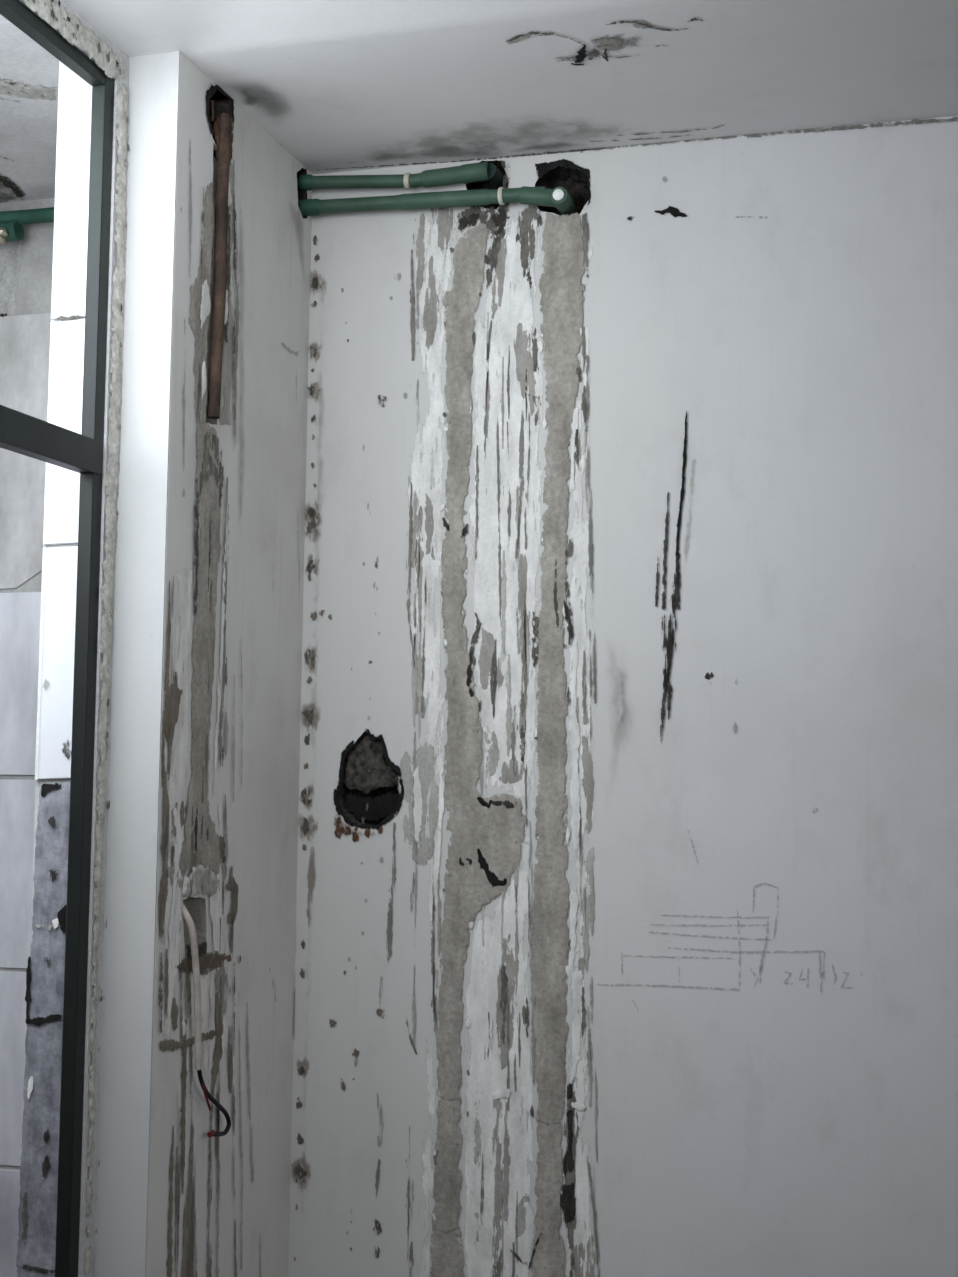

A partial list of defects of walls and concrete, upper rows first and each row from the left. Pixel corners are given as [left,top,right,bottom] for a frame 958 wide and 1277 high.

corrosion [211,100,233,152]
water stain [323,148,606,170]
spalling [466,160,509,190]
spalling [311,235,321,307]
spalling [307,508,316,533]
peeling [214,528,227,794]
peeling [159,430,224,1037]
spalling [302,708,314,745]
peeling [333,207,460,1277]
peeling [463,166,591,1277]
spalling [300,788,312,851]
peeling [560,326,600,1277]